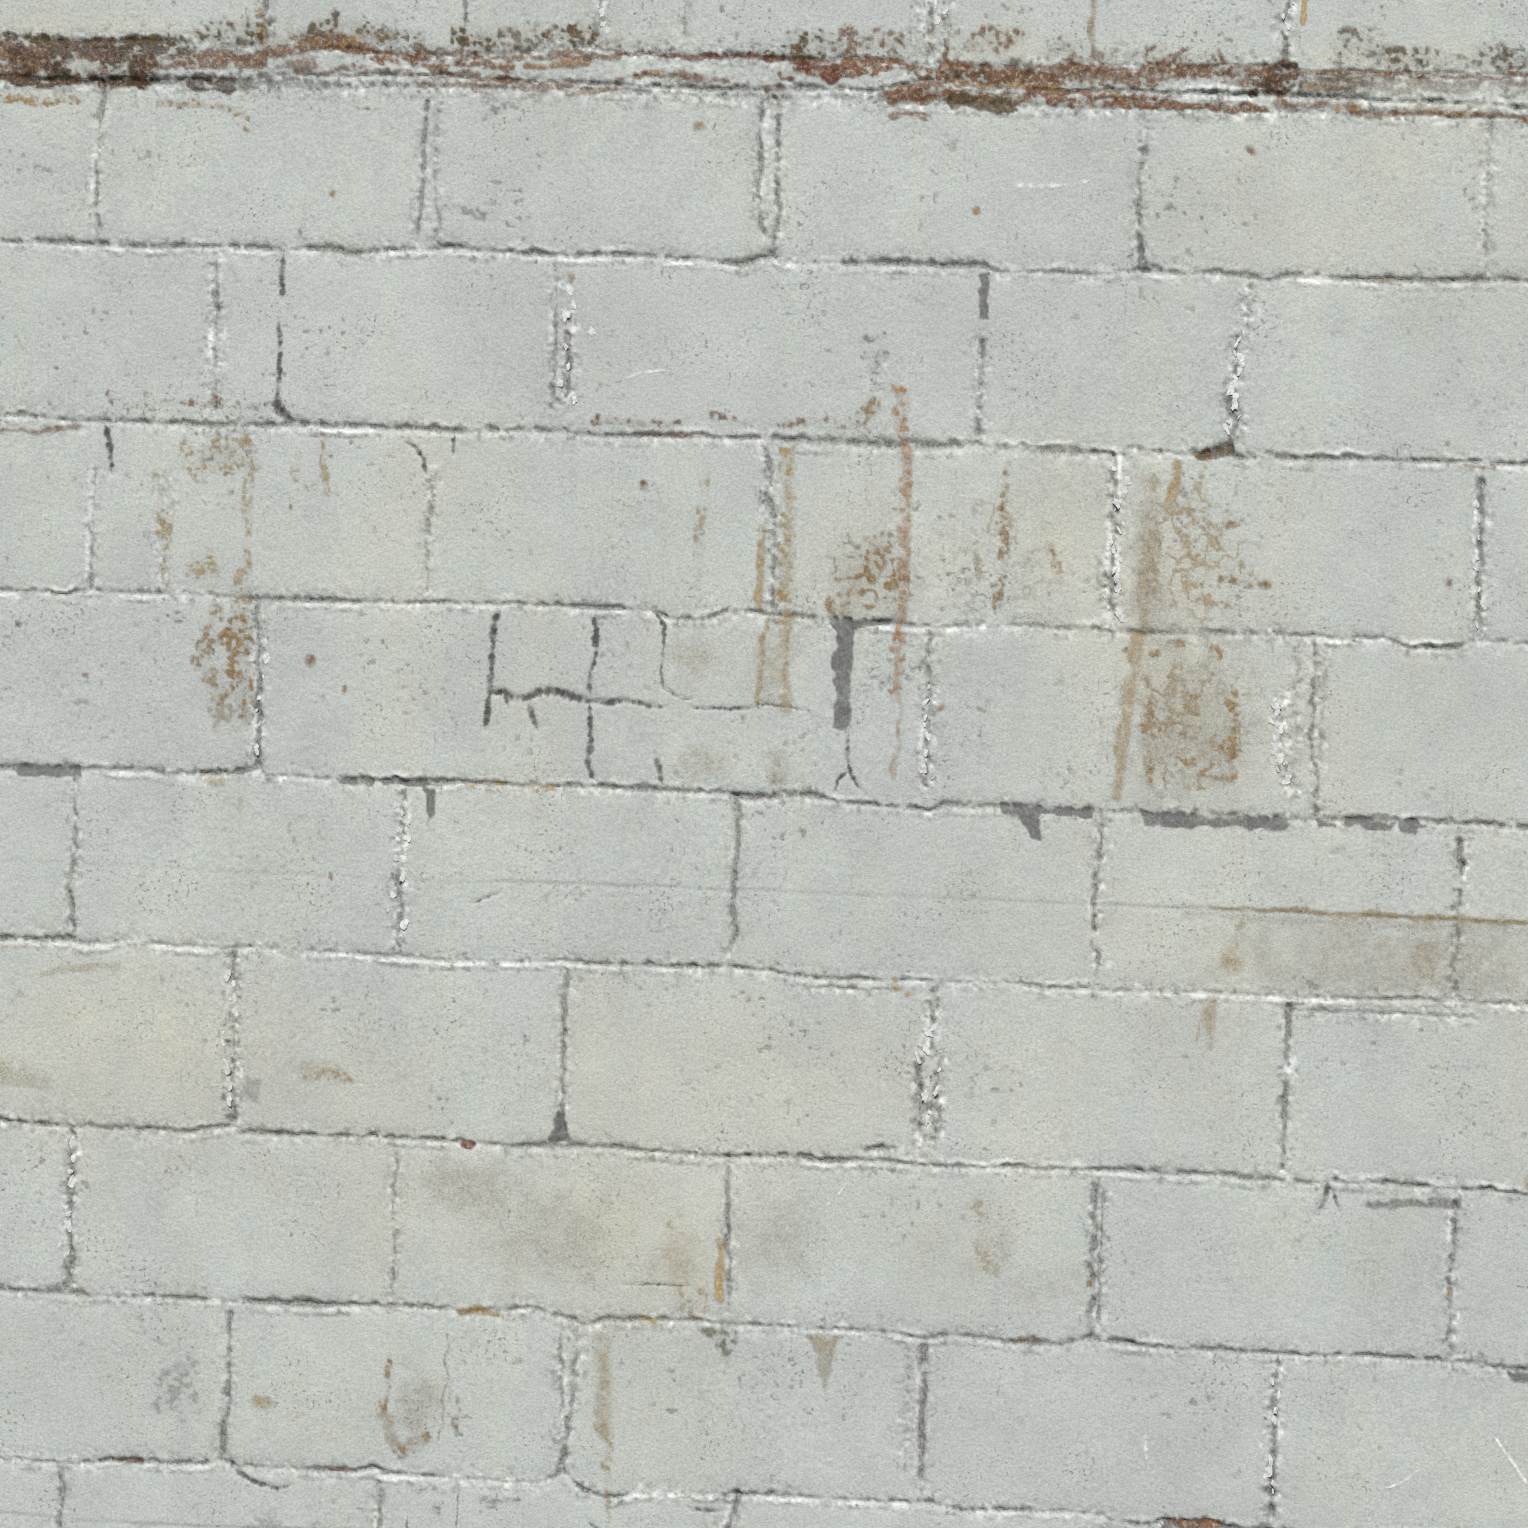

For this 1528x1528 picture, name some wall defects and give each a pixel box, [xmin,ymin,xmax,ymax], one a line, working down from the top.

corrosion [0,34,194,107]
corrosion [169,73,254,130]
corrosion [255,9,629,80]
corrosion [620,39,1528,123]
corrosion [192,550,253,724]
crack [484,614,666,778]
corrosion [754,493,795,642]
crack [836,747,857,784]
corrosion [826,384,919,693]
corrosion [1114,646,1242,788]
corrosion [1149,460,1268,602]